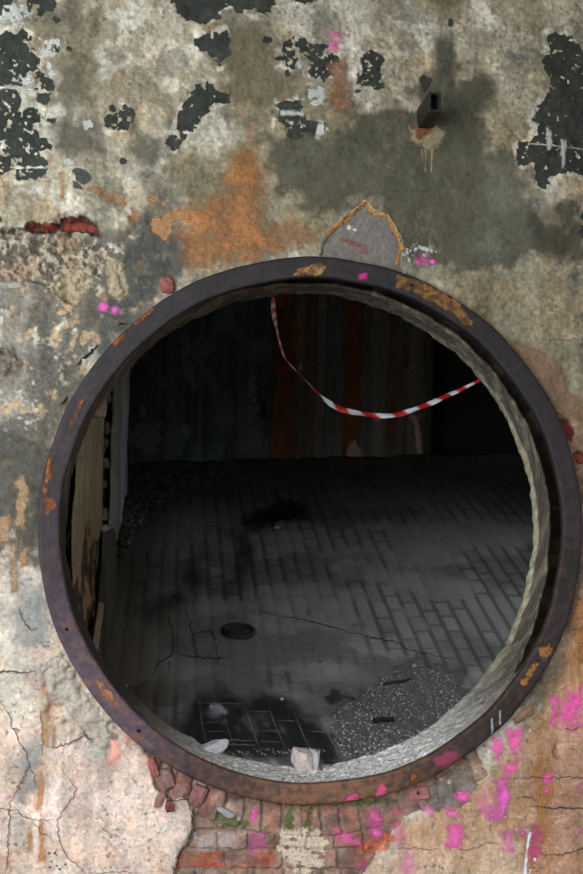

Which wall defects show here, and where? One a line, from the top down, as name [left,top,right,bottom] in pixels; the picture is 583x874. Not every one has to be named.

peeling [0,0,72,194]
rust [147,151,288,269]
damp [266,37,583,271]
rust [408,124,446,173]
peeling [516,32,583,189]
damp [244,499,306,529]
rust [520,644,552,686]
crack [0,702,141,874]
damp [183,687,341,765]
flaking render [144,749,487,874]
crack [507,726,583,810]
crack [540,847,583,856]